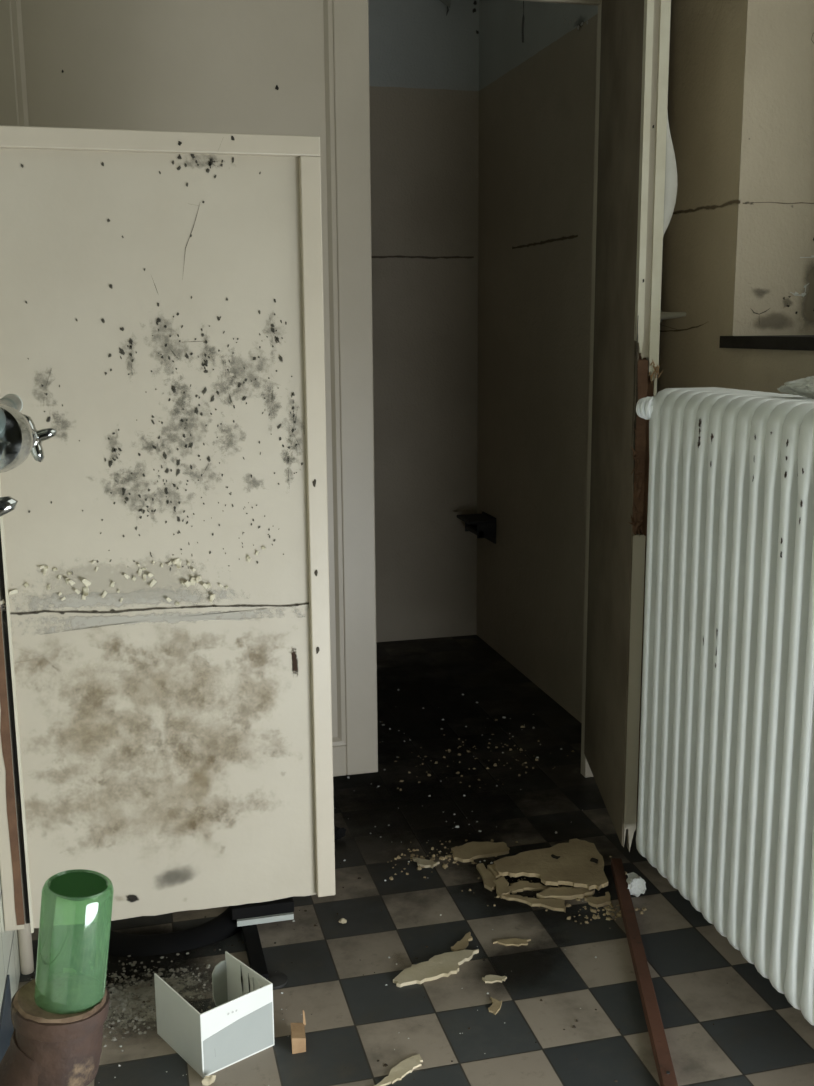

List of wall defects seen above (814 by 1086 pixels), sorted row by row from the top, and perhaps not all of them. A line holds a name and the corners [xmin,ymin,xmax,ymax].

crack [673,200,814,214]
damp [757,264,814,328]
damp [110,299,287,571]
peeling [40,558,229,603]
crack [10,602,309,615]